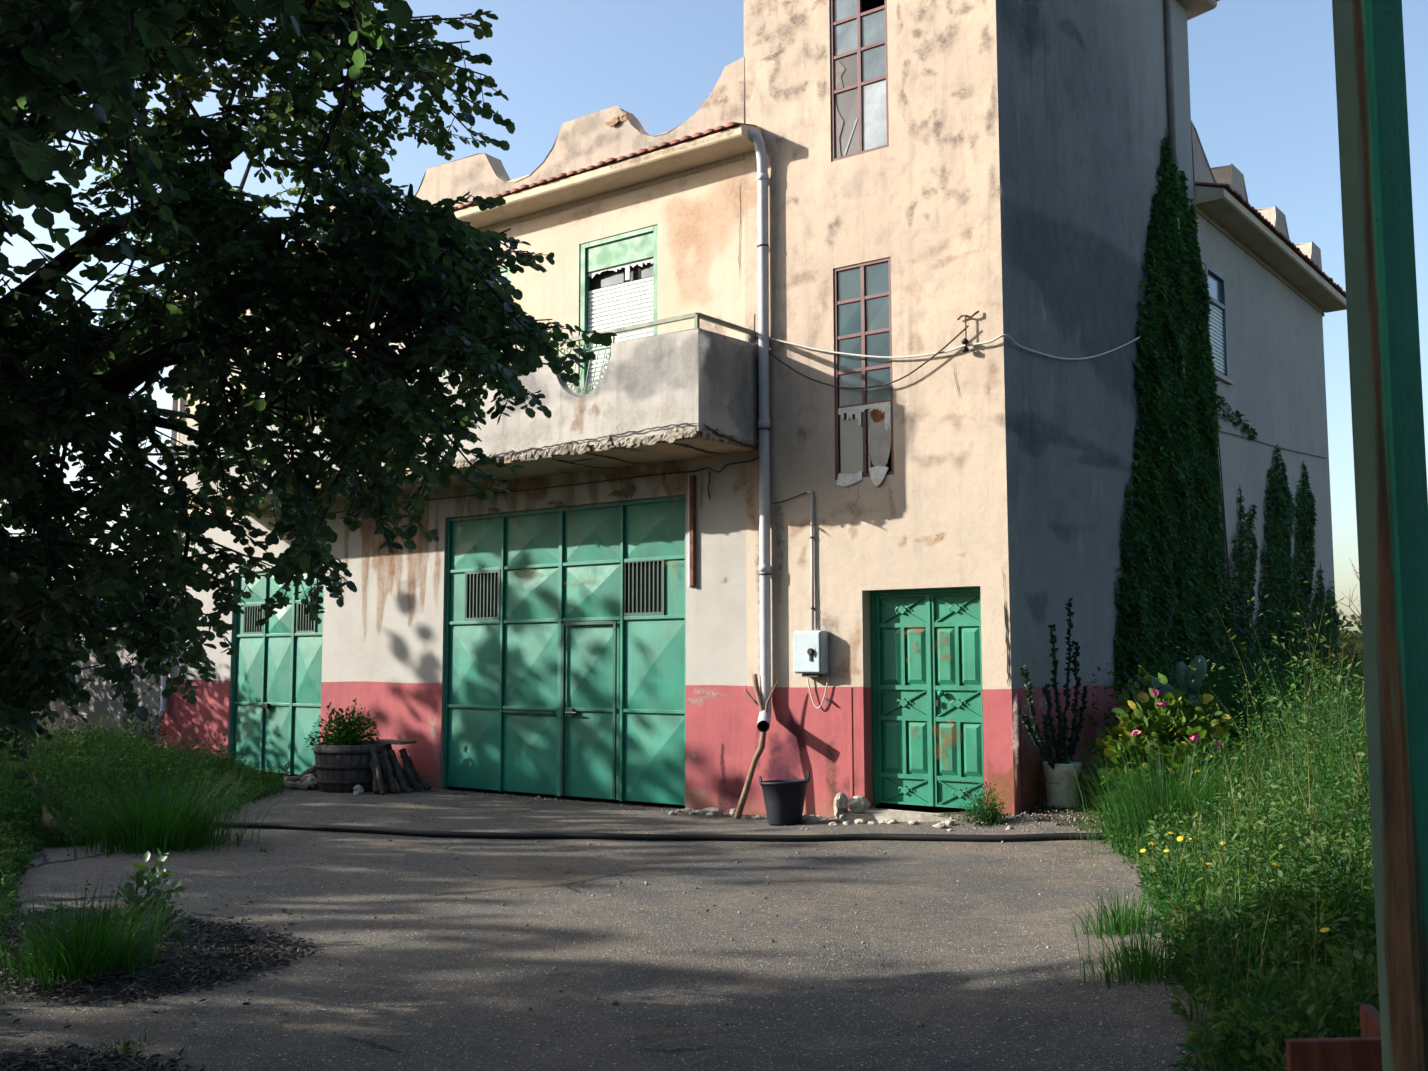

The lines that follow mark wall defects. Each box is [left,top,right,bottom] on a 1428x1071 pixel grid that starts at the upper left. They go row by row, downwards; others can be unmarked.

spalling [437,427,758,470]
corrosion [345,495,440,623]
damp [768,717,805,780]